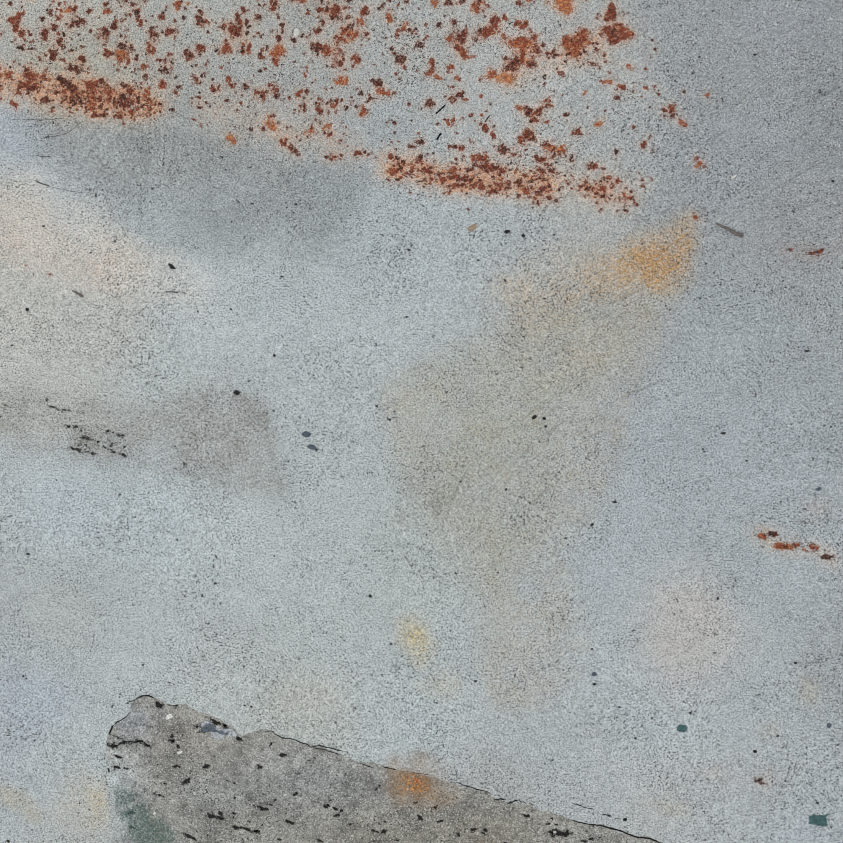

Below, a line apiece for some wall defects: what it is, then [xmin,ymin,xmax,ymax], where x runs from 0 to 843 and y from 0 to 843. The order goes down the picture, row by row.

rust [0,0,717,408]
rust [735,493,843,577]
spalling [106,696,658,843]